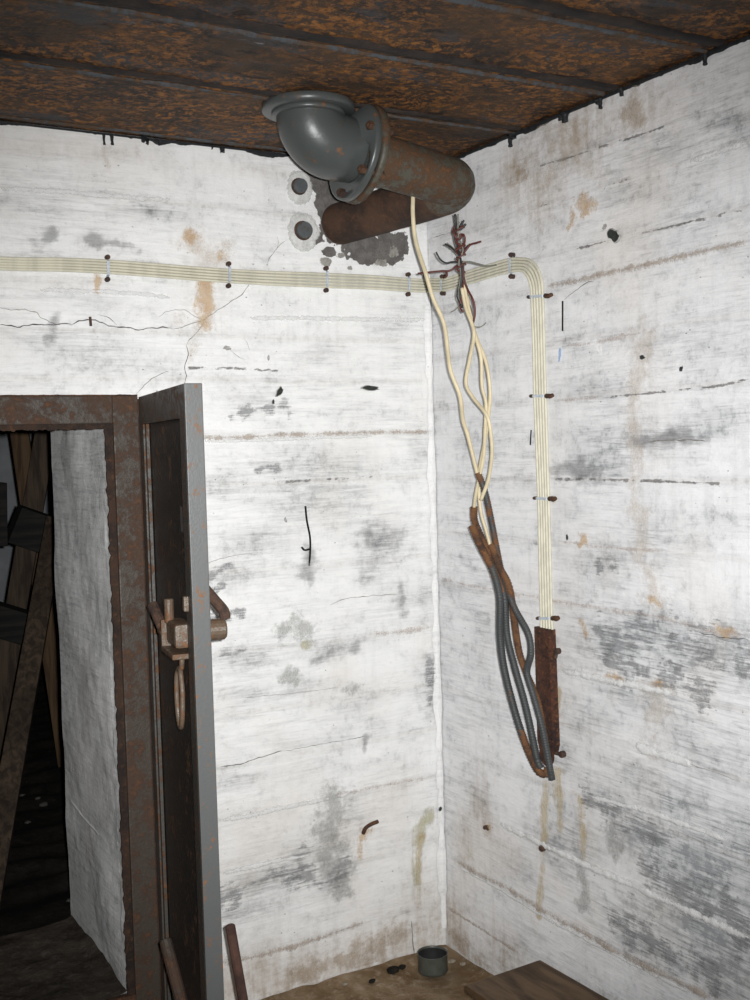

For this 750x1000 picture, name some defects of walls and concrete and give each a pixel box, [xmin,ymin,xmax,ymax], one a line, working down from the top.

rust [198,281,213,328]
crack [0,285,249,393]
crack [226,736,364,767]
damp [413,813,434,878]